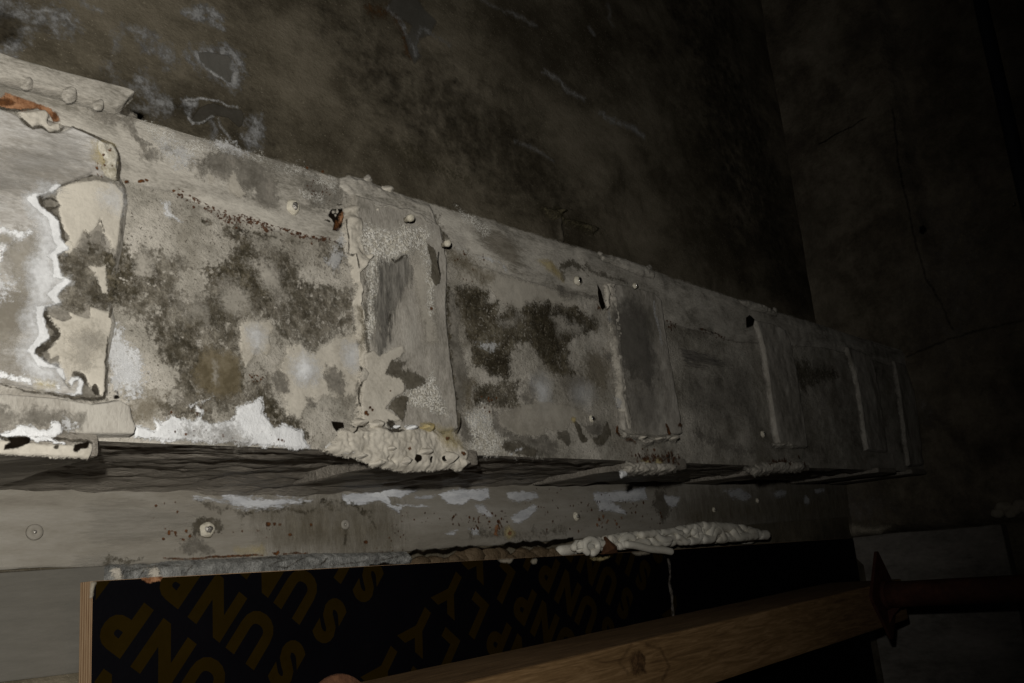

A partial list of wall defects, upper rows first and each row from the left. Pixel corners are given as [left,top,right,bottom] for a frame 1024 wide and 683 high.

peeling [0,92,125,396]
corrosion [172,188,336,245]
damp [58,205,654,458]
spalling [0,435,93,459]
damp [162,488,493,555]
damp [507,491,538,524]